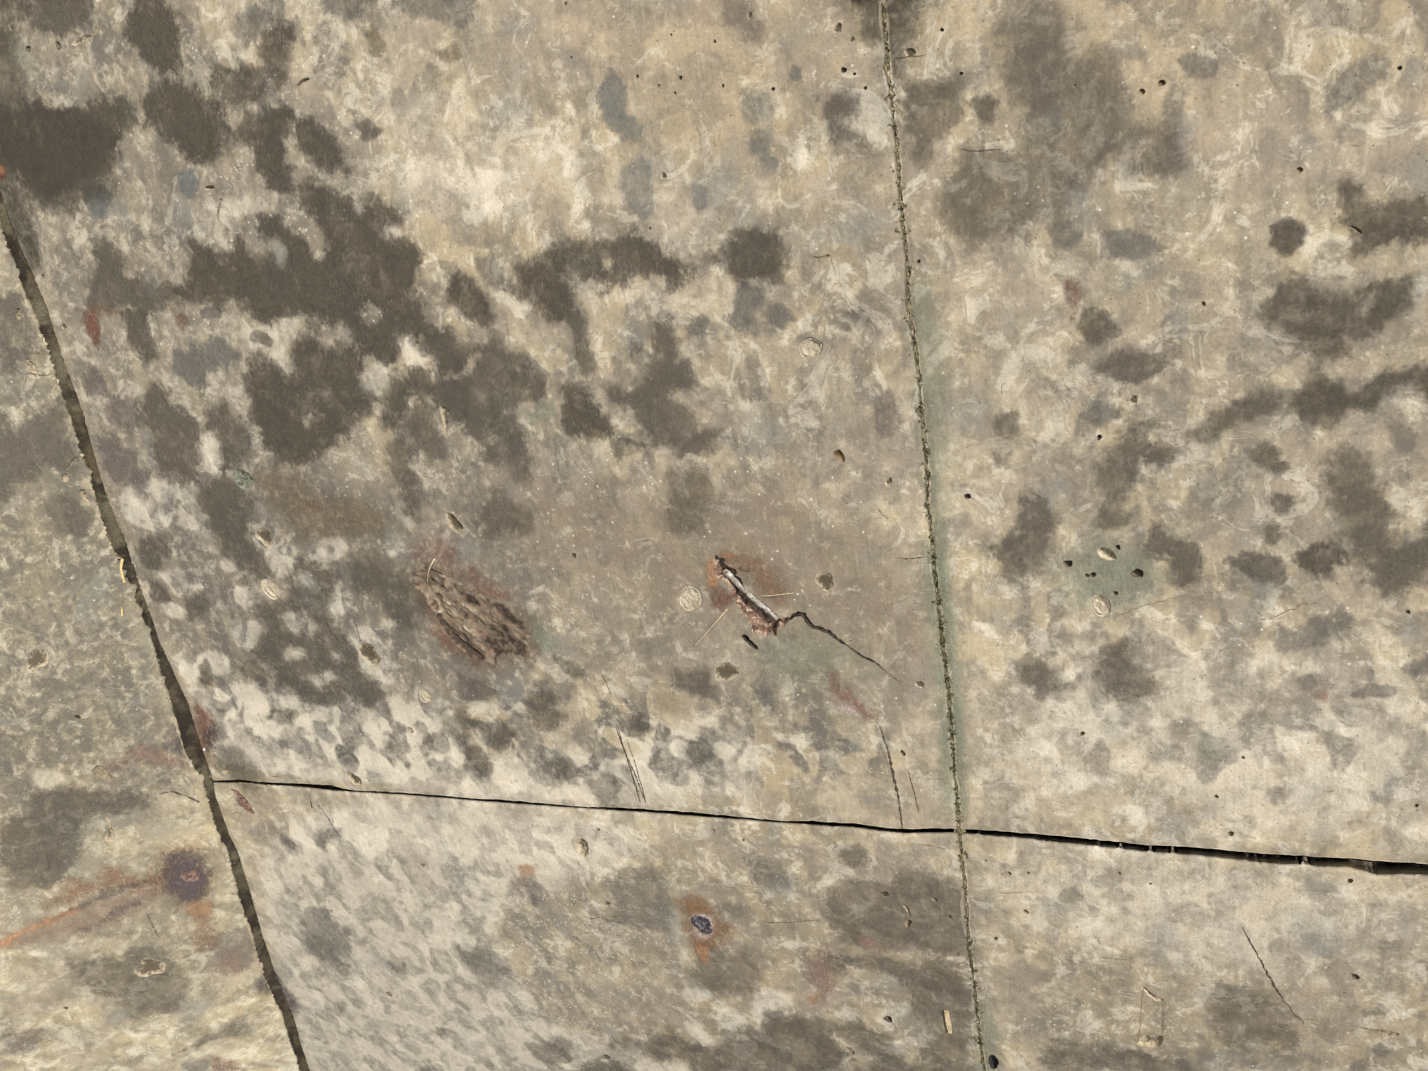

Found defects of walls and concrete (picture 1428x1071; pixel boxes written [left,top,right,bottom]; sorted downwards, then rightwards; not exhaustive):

damp [0,0,127,219]
damp [1271,218,1306,254]
damp [86,0,714,577]
damp [1270,276,1413,355]
damp [1296,367,1428,419]
damp [1229,454,1428,595]
damp [241,559,381,705]
spalling [414,559,531,665]
crack [742,634,758,650]
crack [786,611,901,683]
rust [0,851,211,946]
rust [680,897,729,957]